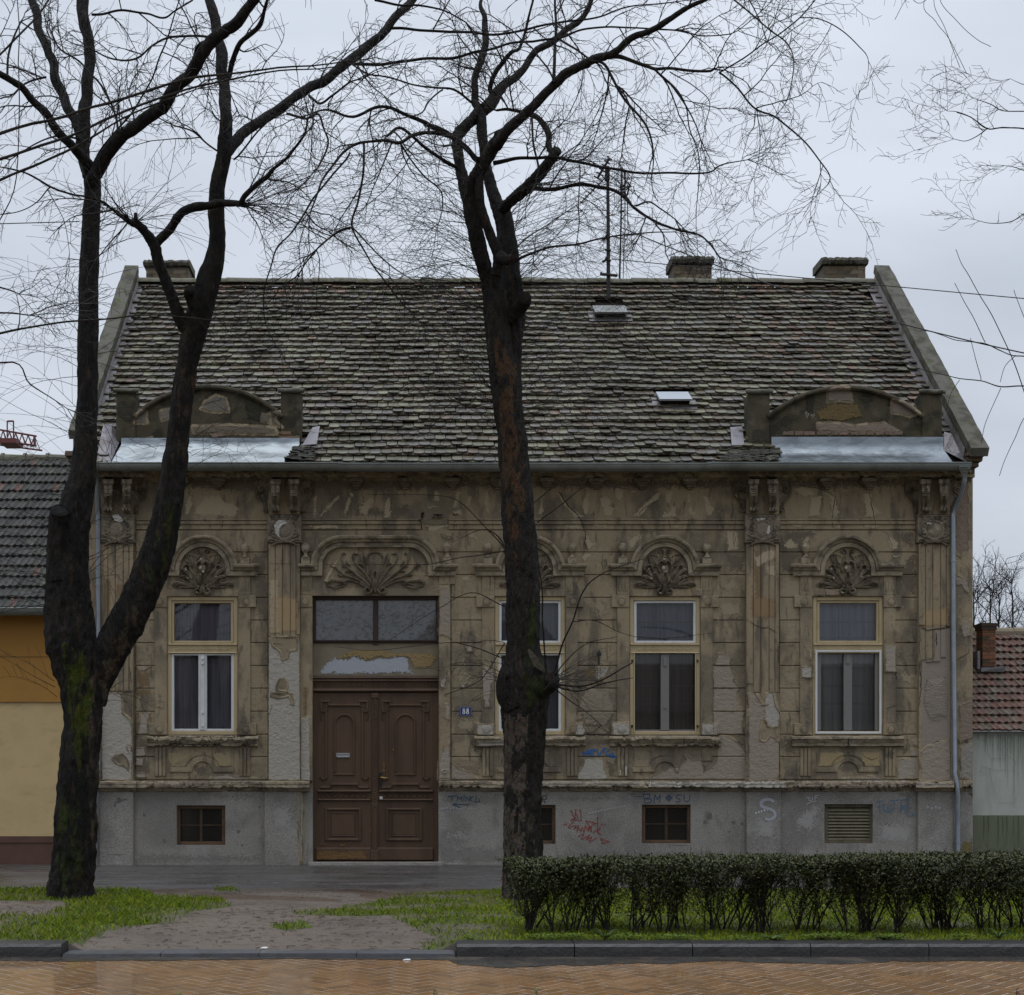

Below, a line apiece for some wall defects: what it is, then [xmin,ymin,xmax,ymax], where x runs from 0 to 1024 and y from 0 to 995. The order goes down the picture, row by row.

peeling [133,407,170,425]
peeling [191,393,300,438]
peeling [783,398,921,435]
peeling [309,492,391,530]
peeling [556,488,637,561]
peeling [320,656,413,675]
peeling [542,606,973,791]
spalling [100,579,368,865]
peeling [437,665,504,784]